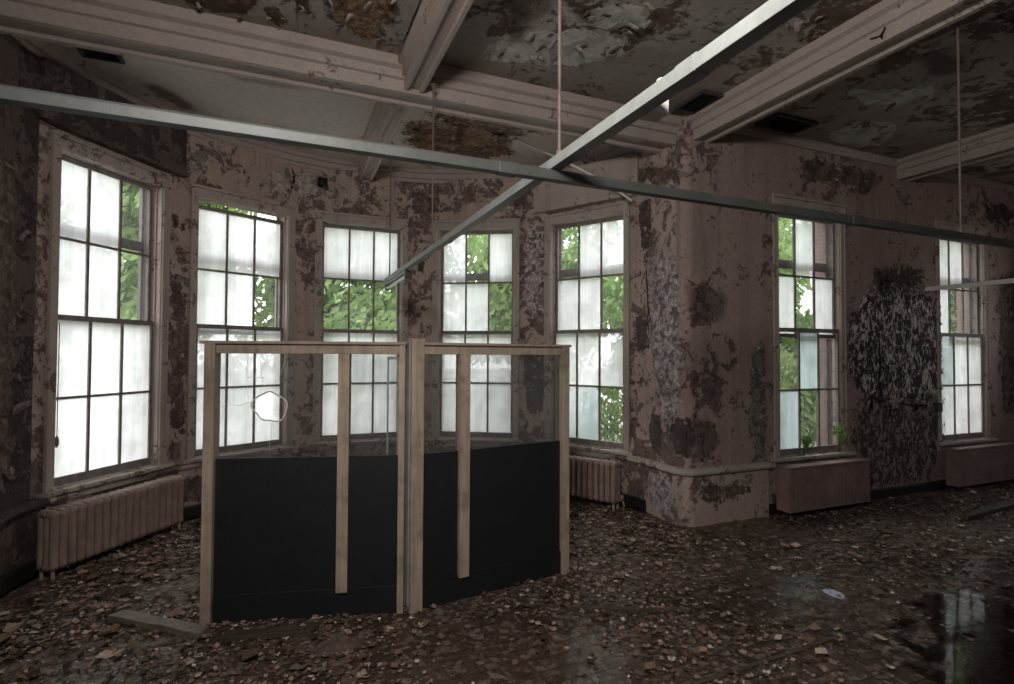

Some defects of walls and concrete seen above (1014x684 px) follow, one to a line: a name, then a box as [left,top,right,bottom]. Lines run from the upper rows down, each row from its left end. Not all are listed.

peeling [186,0,311,29]
peeling [322,0,401,42]
peeling [476,1,657,70]
peeling [838,80,951,112]
flaking render [317,177,328,189]
peeling [410,191,444,217]
peeling [506,190,534,216]
flaking render [172,213,187,231]
peeling [519,225,544,319]
peeling [693,479,753,504]